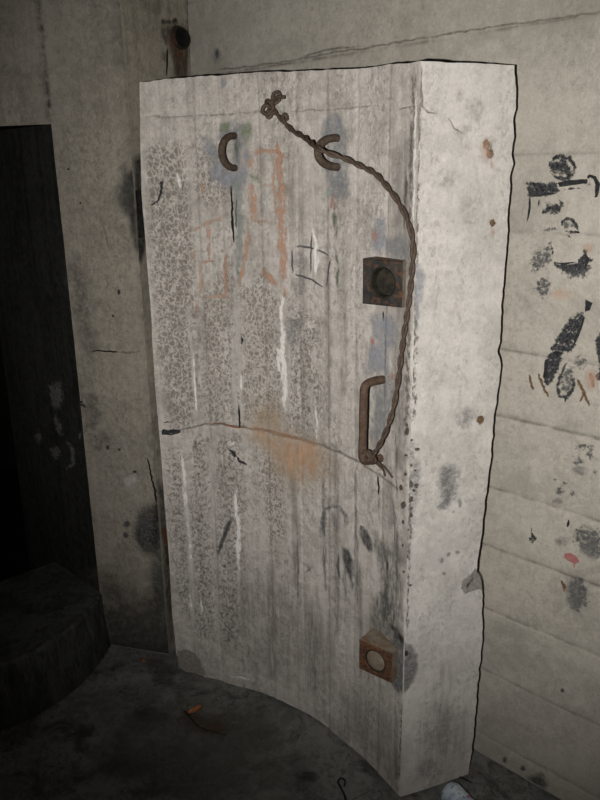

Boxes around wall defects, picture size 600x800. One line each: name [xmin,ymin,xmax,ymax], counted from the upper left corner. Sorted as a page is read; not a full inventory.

crack [180,406,394,495]
water stain [103,487,171,653]
spalling [461,569,482,594]